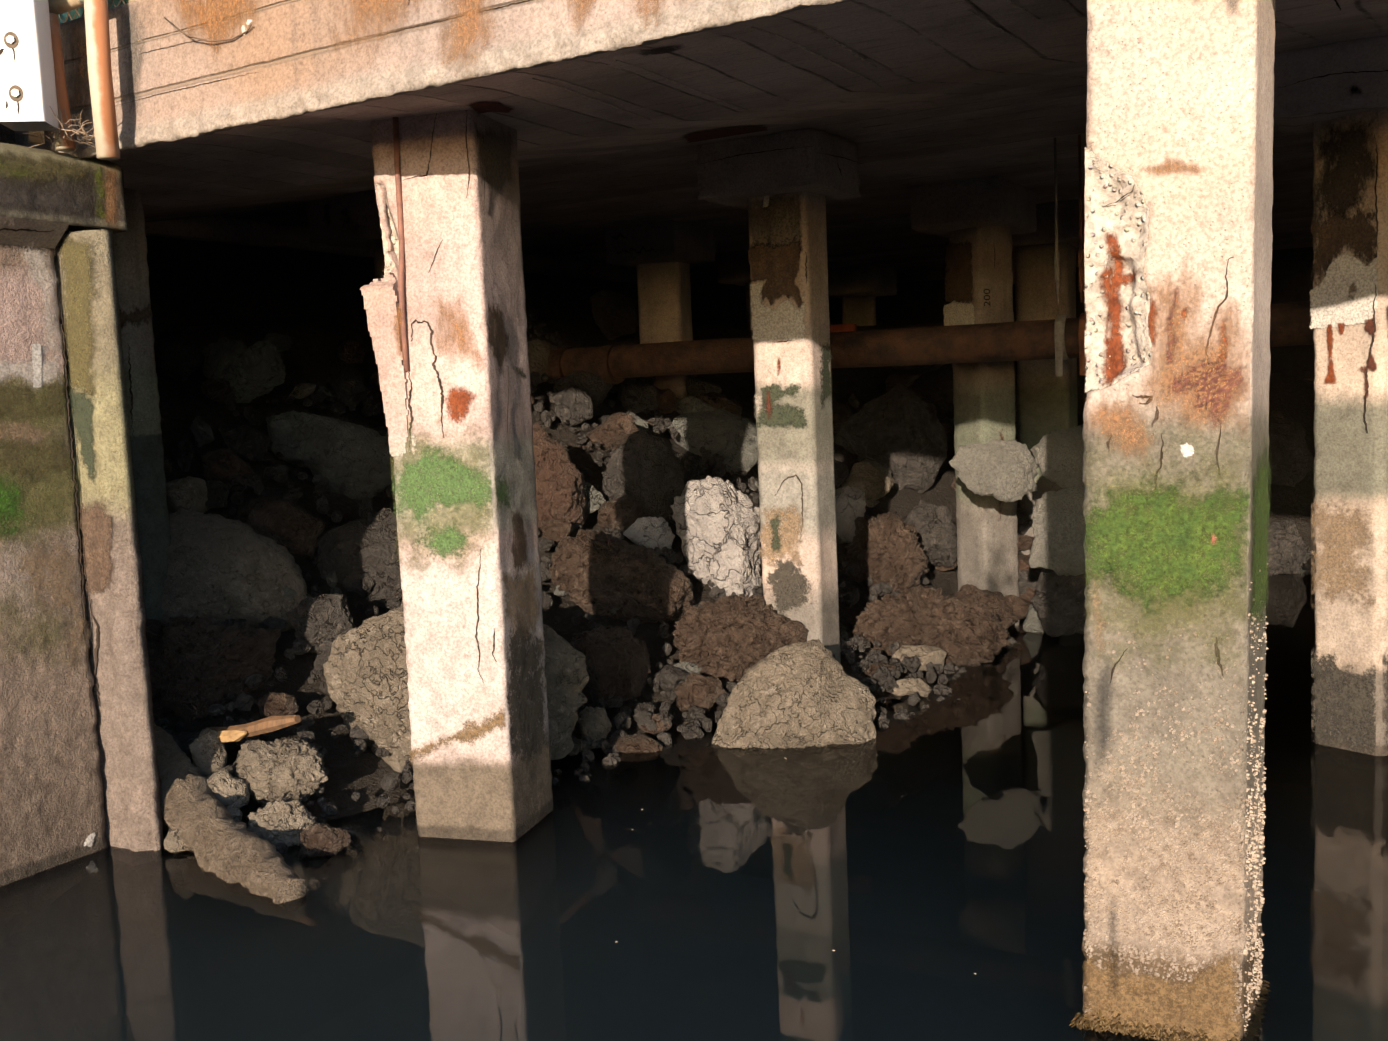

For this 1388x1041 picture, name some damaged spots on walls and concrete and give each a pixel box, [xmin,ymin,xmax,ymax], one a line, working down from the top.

spalling [375,117,410,371]
crack [408,319,444,453]
rust [447,388,476,422]
spalling [1084,148,1152,392]
rust [1100,234,1136,385]
rust [1148,287,1250,425]
crack [1205,257,1233,478]
rust [1325,323,1345,383]
peeling [1309,252,1378,329]
water stain [1311,119,1378,281]
water stain [410,511,547,761]
water stain [1311,649,1388,754]